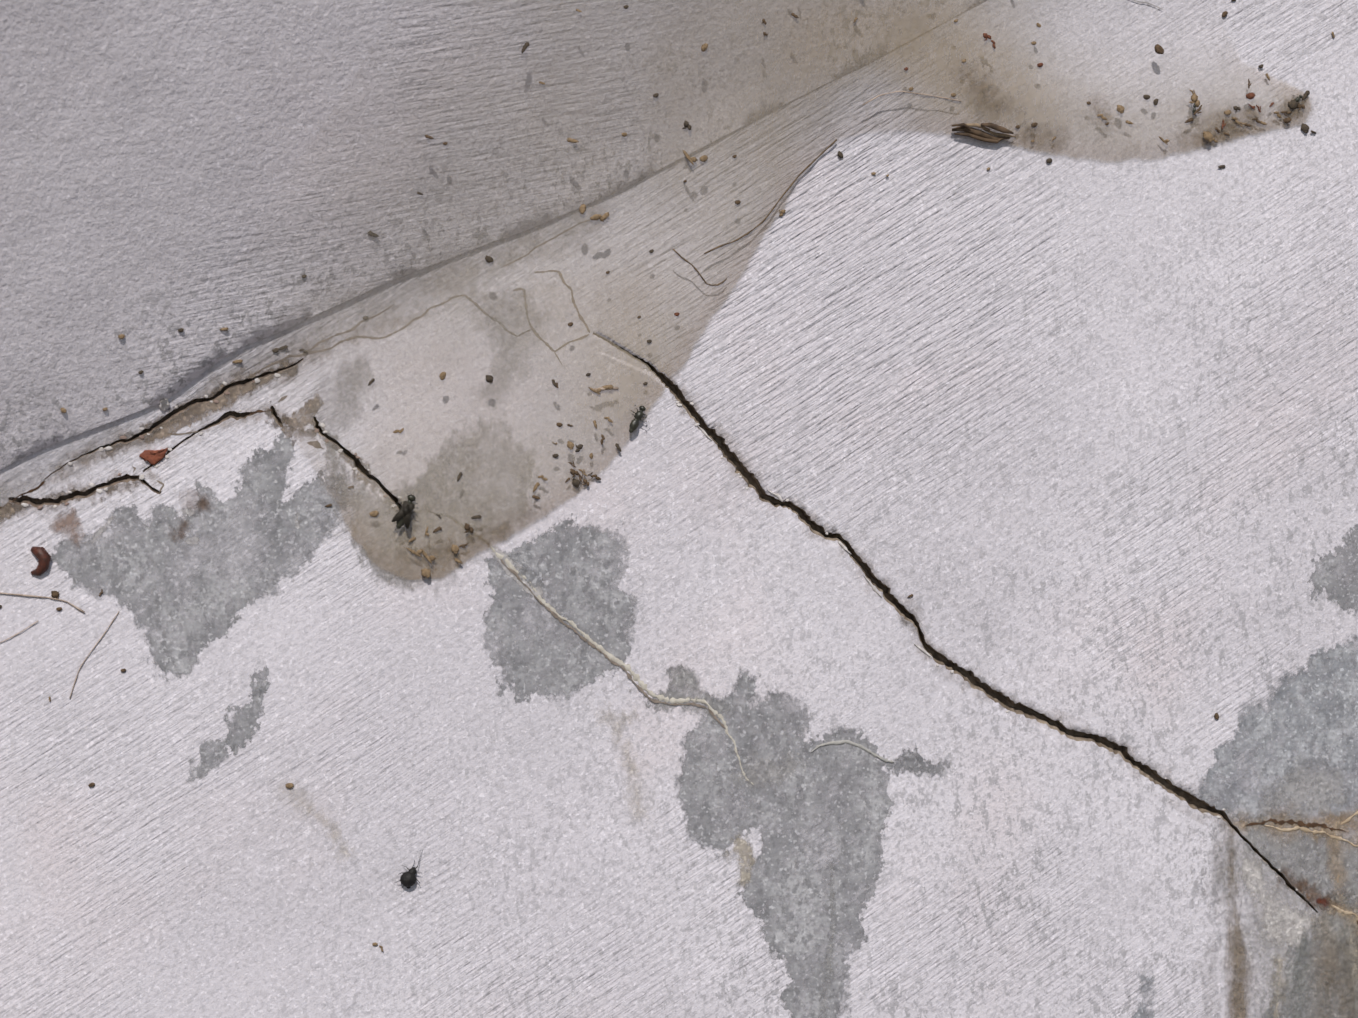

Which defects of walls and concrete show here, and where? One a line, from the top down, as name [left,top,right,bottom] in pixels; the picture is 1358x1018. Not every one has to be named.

spalling [139,448,168,465]
crack [0,220,1318,913]
water stain [1199,637,1358,1018]